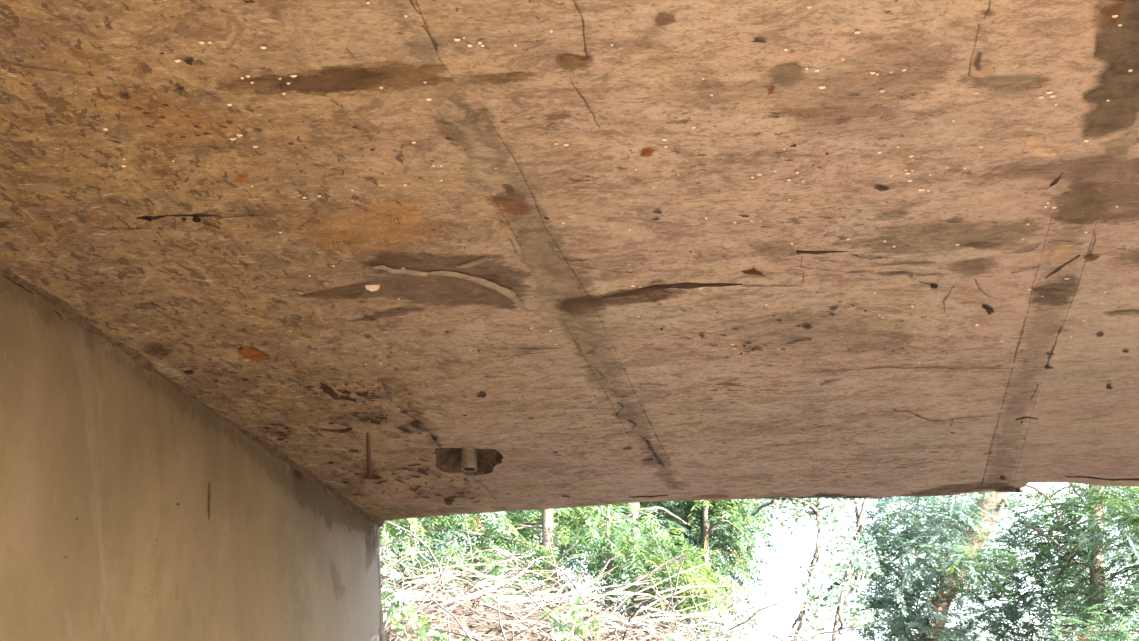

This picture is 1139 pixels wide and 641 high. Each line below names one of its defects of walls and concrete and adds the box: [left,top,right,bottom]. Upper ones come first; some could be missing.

water stain [221,64,524,200]
water stain [475,72,534,83]
water stain [557,54,592,71]
water stain [968,0,1139,224]
corrosion [239,347,271,361]
water stain [301,231,679,392]
spalling [304,383,503,505]
crack [1065,474,1139,482]